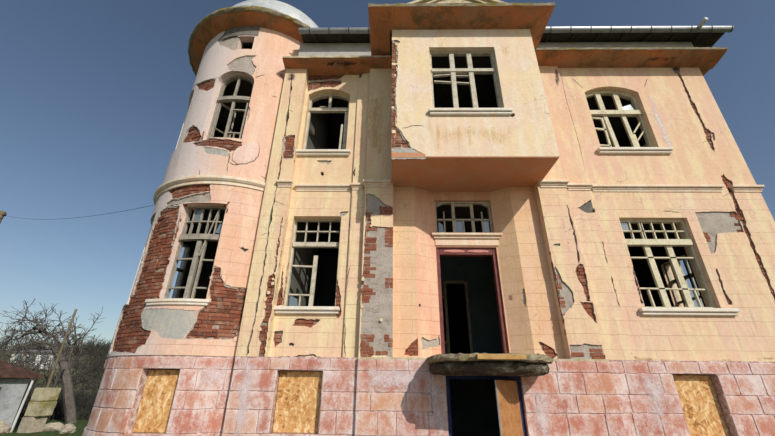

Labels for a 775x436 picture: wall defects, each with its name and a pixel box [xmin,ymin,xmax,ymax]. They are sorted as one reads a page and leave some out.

flaking render [197,79,215,91]
flaking render [182,125,242,152]
flaking render [218,37,256,76]
flaking render [391,41,411,149]
crack [677,72,714,147]
flaking render [109,184,211,354]
flaking render [185,266,247,341]
crack [247,162,282,355]
flaking render [360,194,393,357]
flaking render [549,244,605,359]
flaking render [696,212,742,254]
crack [724,183,775,300]